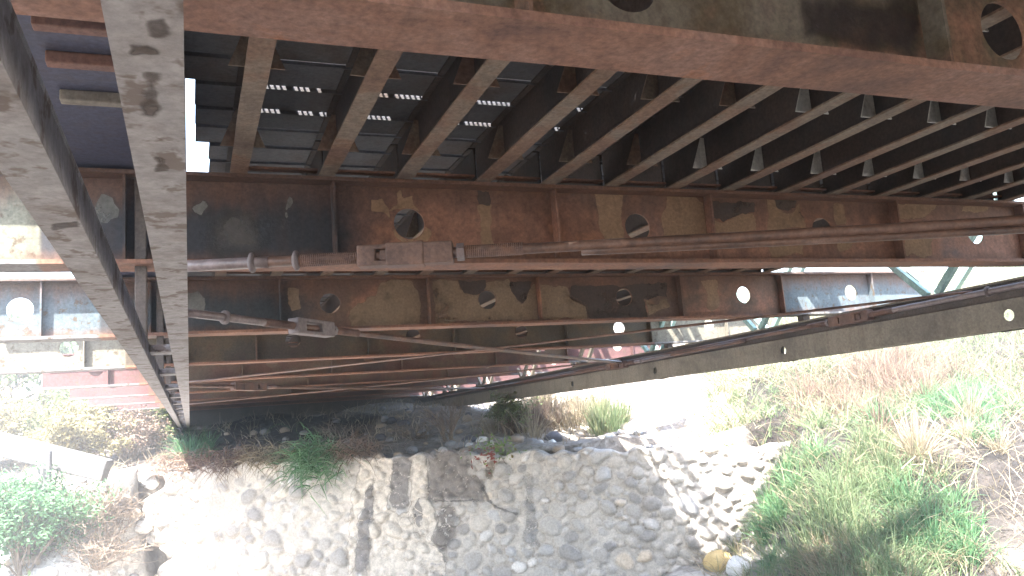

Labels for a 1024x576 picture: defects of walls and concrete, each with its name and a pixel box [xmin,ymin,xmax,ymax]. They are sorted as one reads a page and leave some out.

peeling [371,190,419,218]
peeling [594,194,624,239]
corrosion [712,201,755,222]
peeling [432,279,587,324]
corrosion [510,281,532,303]
corrosion [570,282,667,319]
water stain [346,449,485,576]